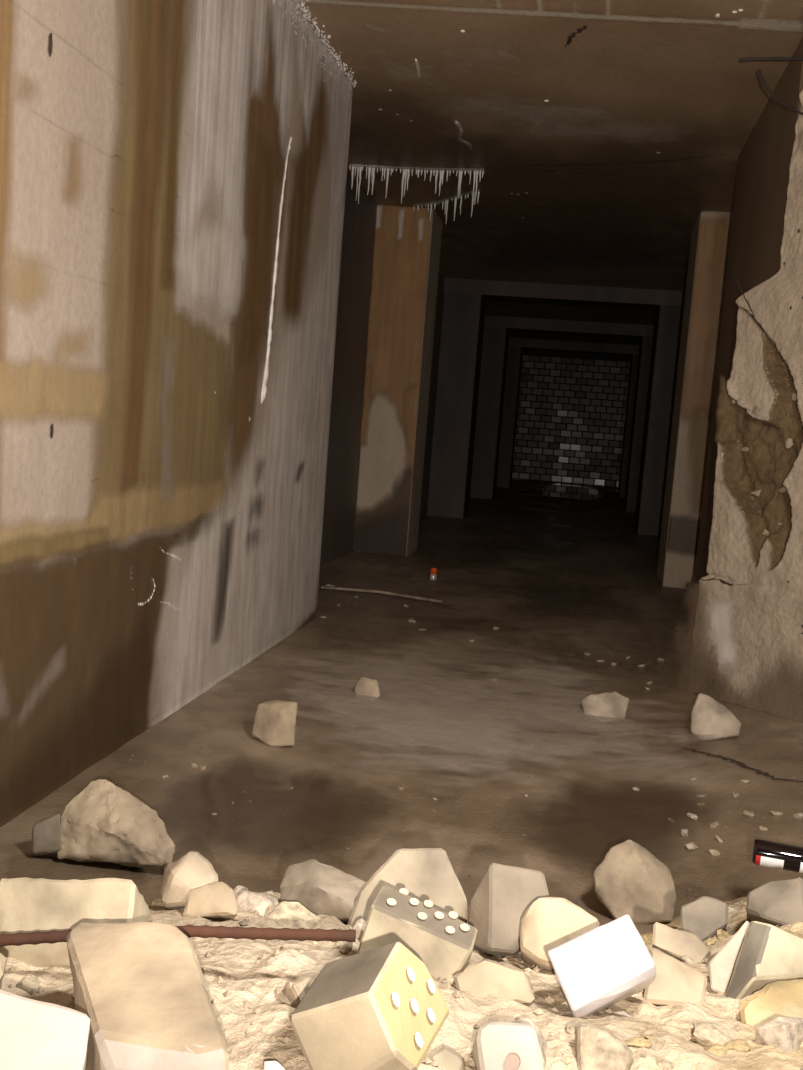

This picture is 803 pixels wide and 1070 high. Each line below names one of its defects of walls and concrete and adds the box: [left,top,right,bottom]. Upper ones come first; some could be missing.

damp [0,0,803,827]
spalling [717,334,803,570]
crack [735,278,803,410]
crack [676,745,803,782]